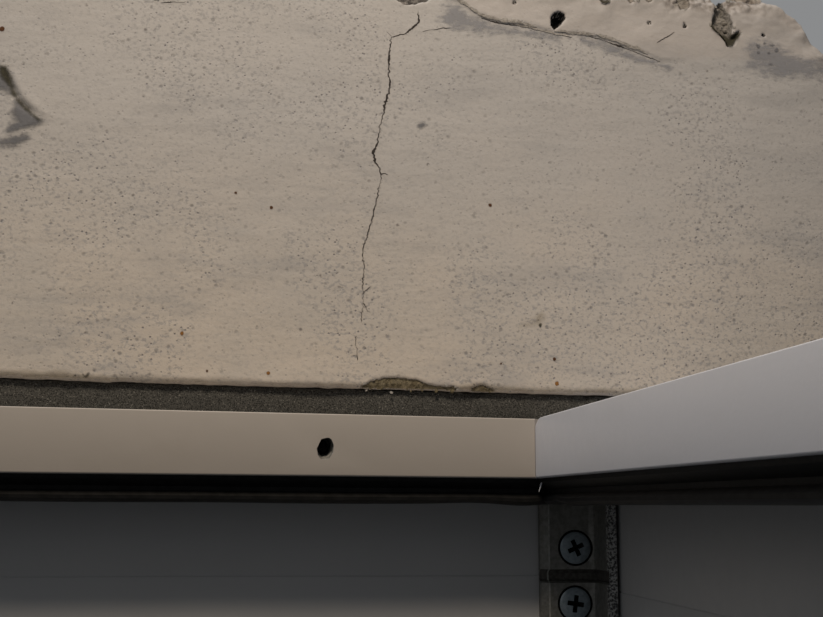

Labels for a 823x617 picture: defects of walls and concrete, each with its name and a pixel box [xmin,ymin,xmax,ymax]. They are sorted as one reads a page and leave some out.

peeling [458,0,655,60]
spalling [709,0,761,47]
damp [0,135,28,144]
crack [355,14,447,360]